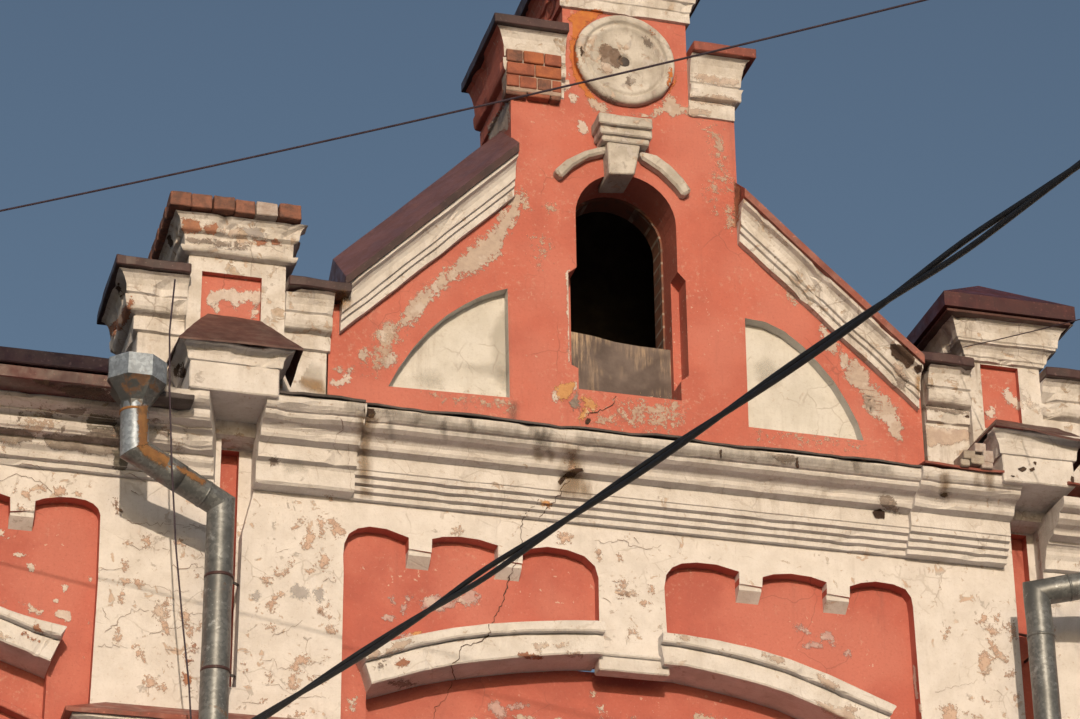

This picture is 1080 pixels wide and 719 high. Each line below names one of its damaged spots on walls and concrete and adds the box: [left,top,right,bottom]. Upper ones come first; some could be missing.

spalling [487,8,617,139]
spalling [599,43,636,86]
spalling [167,218,282,250]
peeling [206,288,263,319]
peeling [329,188,532,389]
peeling [552,381,686,434]
peeling [819,323,915,441]
peeling [151,597,202,692]
peeling [252,515,346,634]
spalling [367,631,422,690]
peeling [381,582,481,622]
crack [434,484,565,713]